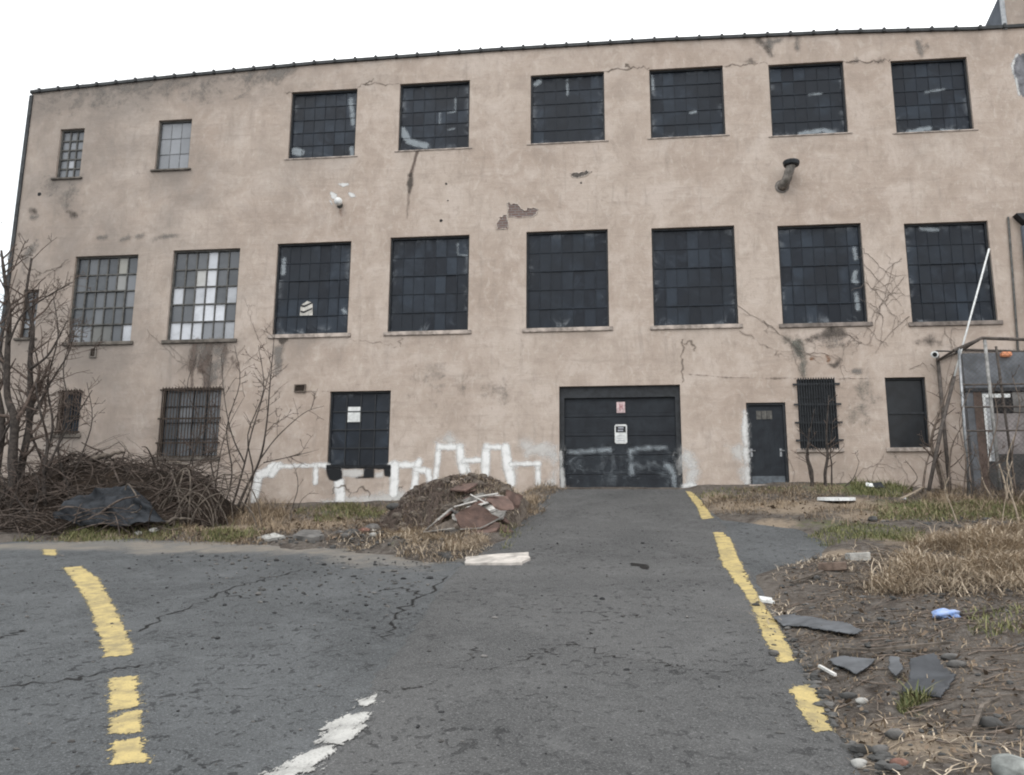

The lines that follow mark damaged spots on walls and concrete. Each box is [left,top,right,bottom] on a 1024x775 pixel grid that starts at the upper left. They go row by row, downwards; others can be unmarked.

spalling [1011,53,1024,97]
spalling [571,170,592,184]
spalling [496,202,538,230]
leakage [189,338,238,391]
leakage [795,327,845,376]